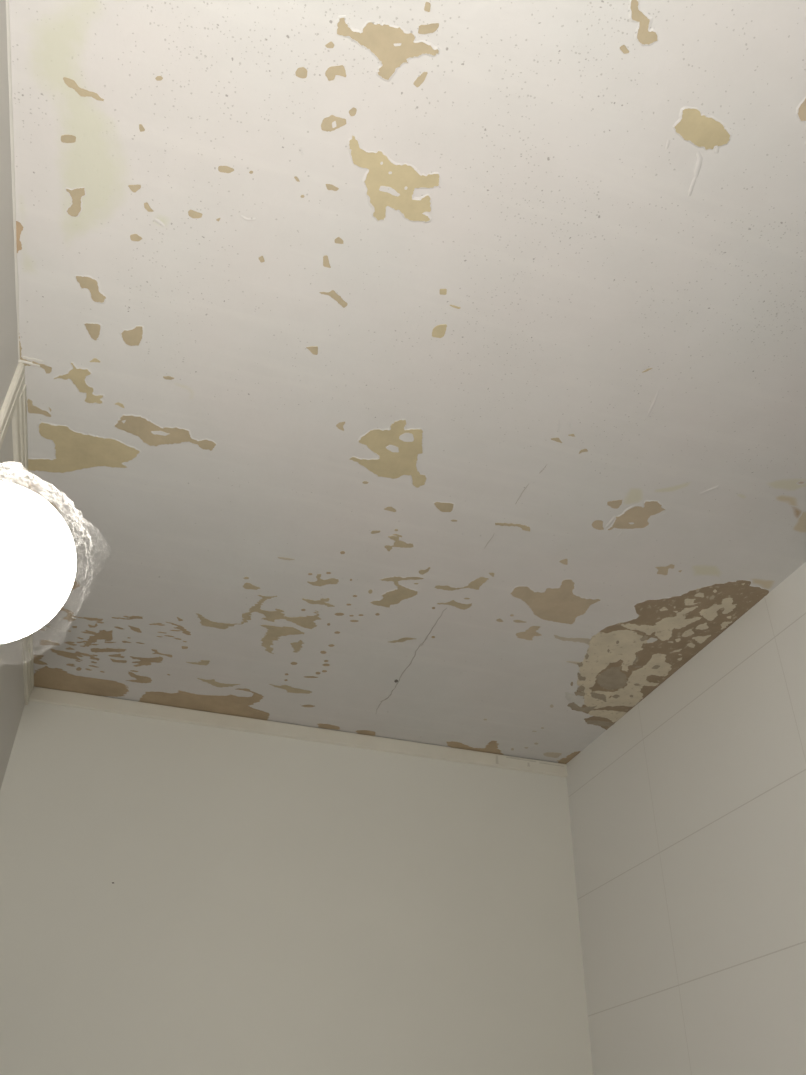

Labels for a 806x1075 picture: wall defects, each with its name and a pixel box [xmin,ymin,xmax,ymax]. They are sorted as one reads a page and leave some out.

peeling [295,67,307,78]
peeling [325,2,441,82]
peeling [413,72,427,87]
peeling [620,0,659,54]
peeling [672,106,732,151]
peeling [321,107,441,223]
peeling [19,336,217,511]
peeling [349,419,428,488]
peeling [592,500,666,531]
peeling [33,567,430,720]
peeling [432,573,495,610]
peeling [496,578,601,645]